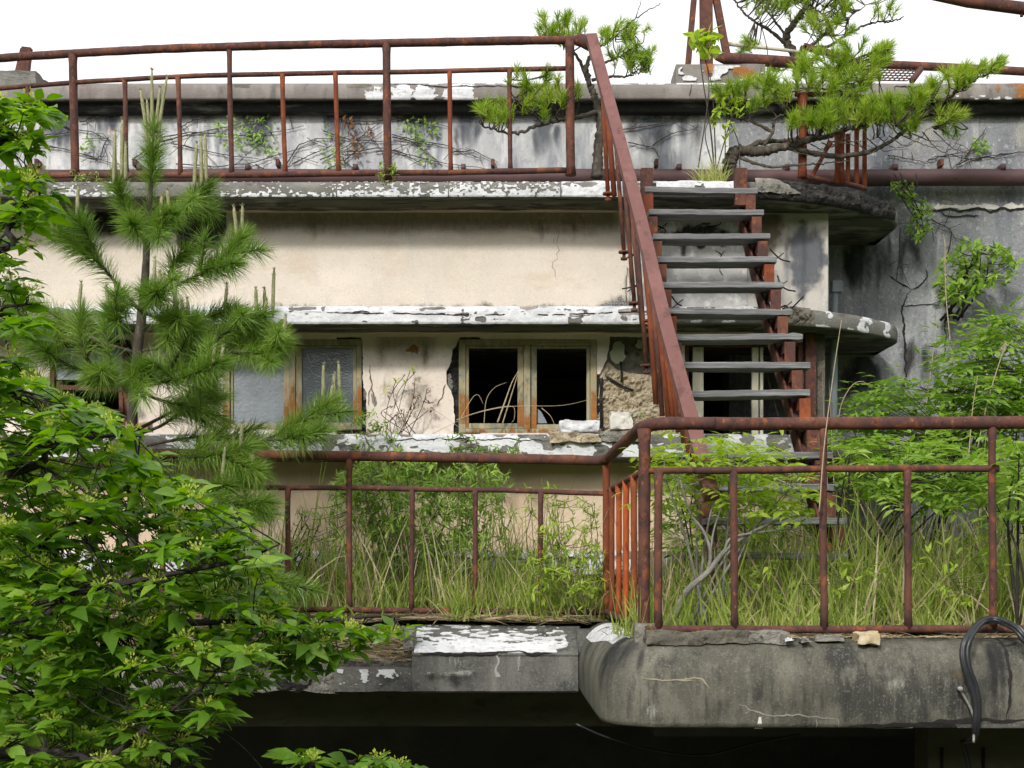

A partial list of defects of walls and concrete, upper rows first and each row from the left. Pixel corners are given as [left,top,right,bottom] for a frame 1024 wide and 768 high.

peeling [53,181,129,197]
peeling [206,181,630,213]
peeling [653,180,734,197]
crack [925,207,1024,217]
peeling [677,306,759,334]
spalling [781,306,833,327]
peeling [847,317,898,342]
crack [890,270,947,386]
peeling [246,306,686,457]
peeling [704,434,794,452]
peeling [414,623,569,653]